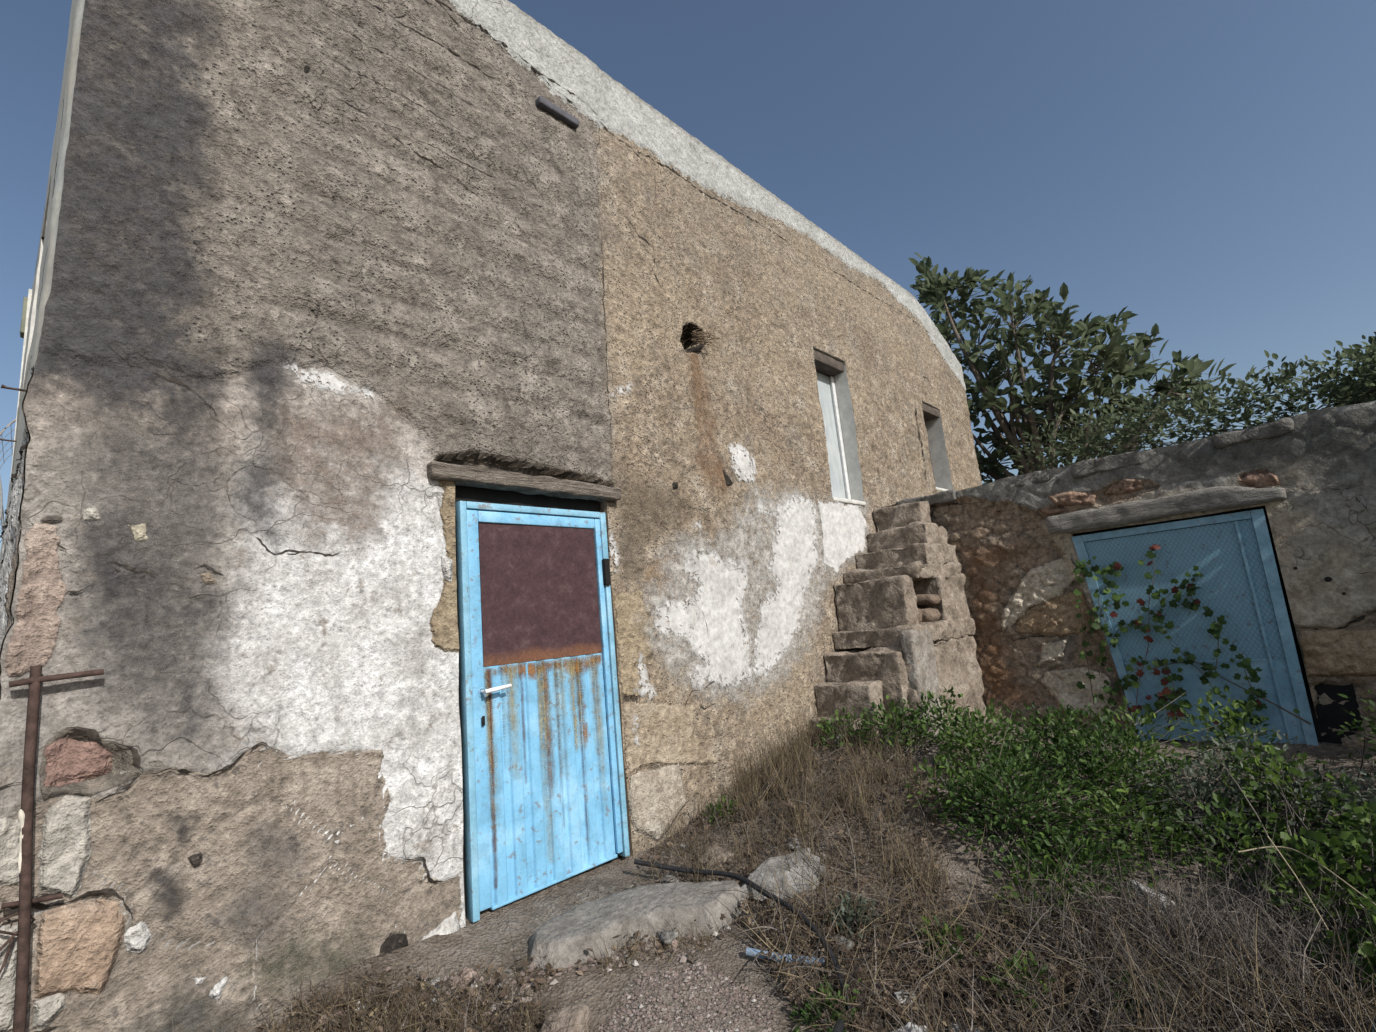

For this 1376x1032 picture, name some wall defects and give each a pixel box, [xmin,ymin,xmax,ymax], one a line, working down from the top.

spalling [0,366,67,685]
spalling [83,508,100,520]
damp [29,0,218,692]
spalling [128,523,148,541]
crack [232,526,354,556]
damp [247,347,391,536]
peeling [285,364,374,398]
peeling [609,525,620,572]
rust [486,655,601,793]
peeling [612,444,868,841]
peeling [1001,554,1112,719]
peeling [0,728,461,1032]